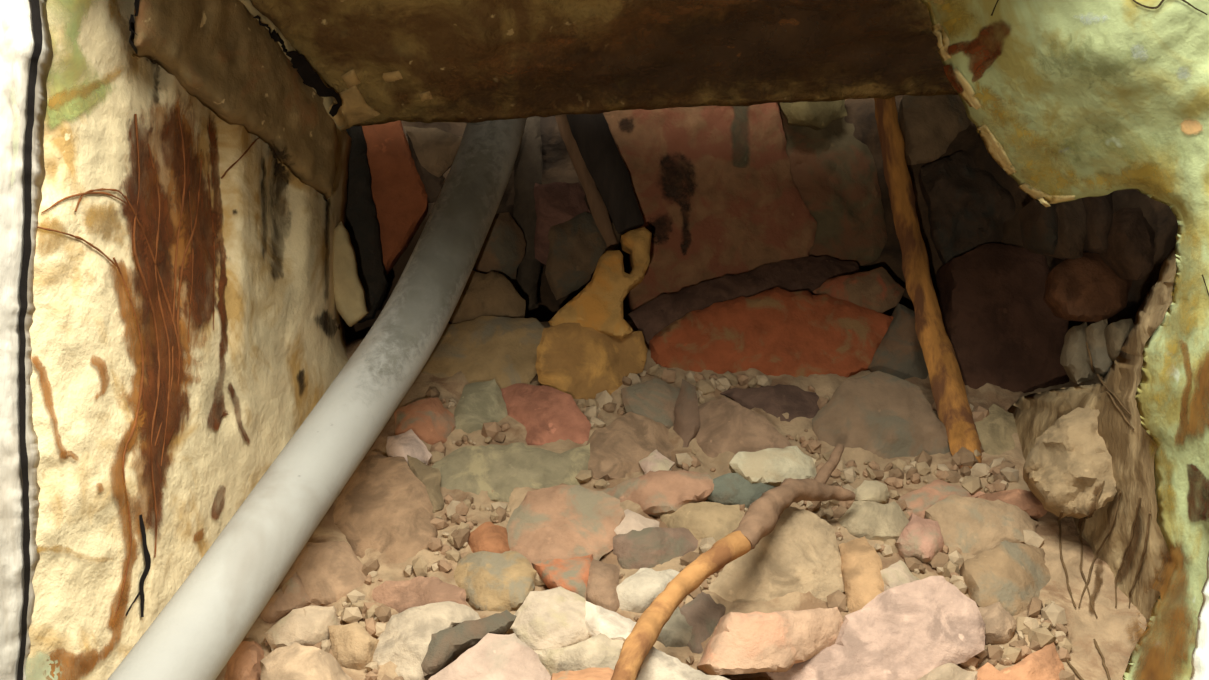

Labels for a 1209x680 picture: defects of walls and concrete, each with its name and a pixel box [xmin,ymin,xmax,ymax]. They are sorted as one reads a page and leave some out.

spalling [329,69,380,130]
spalling [382,71,403,83]
corrosion [943,22,1010,93]
crack [1133,0,1207,15]
flaking render [333,222,368,327]
flaking render [0,0,111,680]
corrosion [31,97,250,680]
flaking render [920,0,1209,680]
crack [125,514,151,617]
corrosion [1128,543,1195,680]